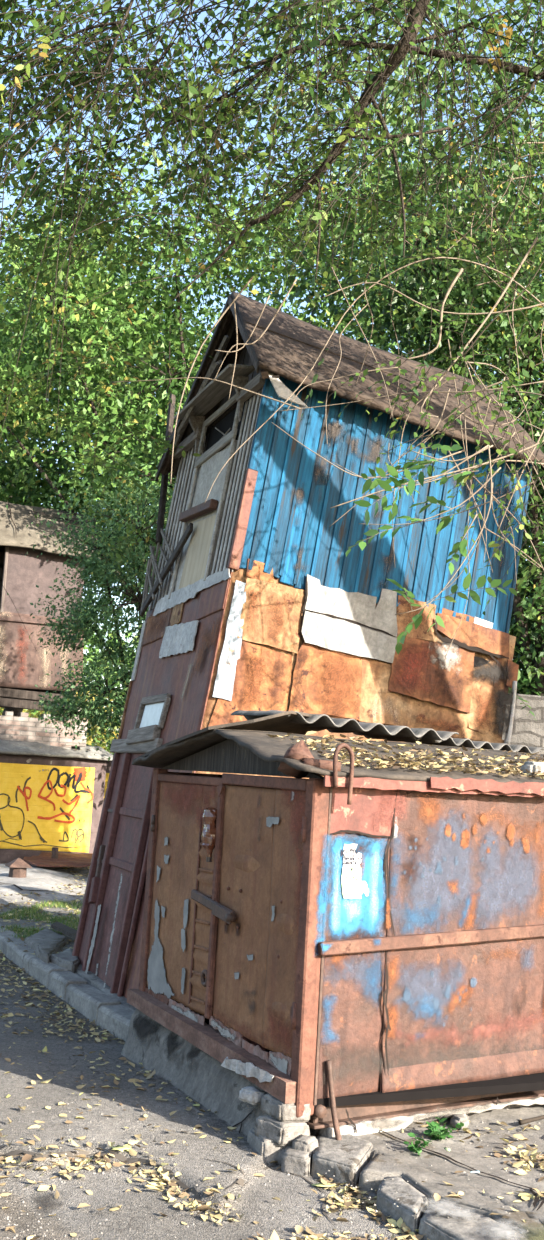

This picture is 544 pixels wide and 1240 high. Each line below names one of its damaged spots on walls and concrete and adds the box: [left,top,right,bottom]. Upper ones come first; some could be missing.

rust [439,672,493,726]
rust [421,799,440,822]
peeling [156,837,169,882]
peeling [316,792,537,999]
rust [466,895,476,928]
rust [329,929,379,963]
peeling [147,899,235,1041]
rust [389,959,397,982]
spalling [133,1016,199,1067]
peeling [324,999,334,1039]
rust [388,1006,398,1037]
peeling [394,963,477,1039]